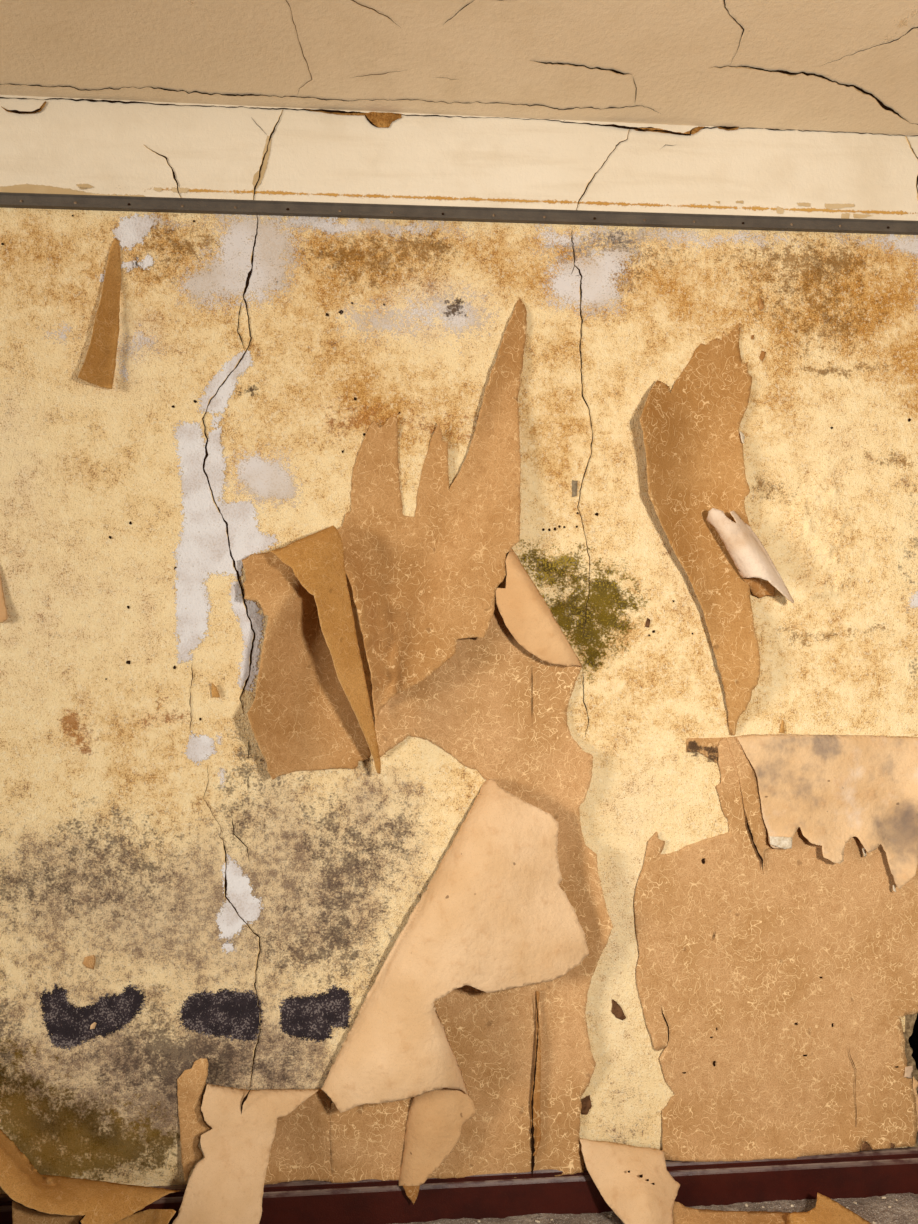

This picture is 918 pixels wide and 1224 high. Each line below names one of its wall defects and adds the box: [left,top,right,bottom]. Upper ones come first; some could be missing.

crack [702,0,918,200]
water stain [145,222,213,278]
crack [0,0,673,711]
crack [188,664,196,736]
mould [519,539,649,683]
mould [0,810,171,916]
crack [203,765,261,1090]
mould [269,796,411,982]
mould [0,1005,299,1183]
hole [908,1013,918,1070]